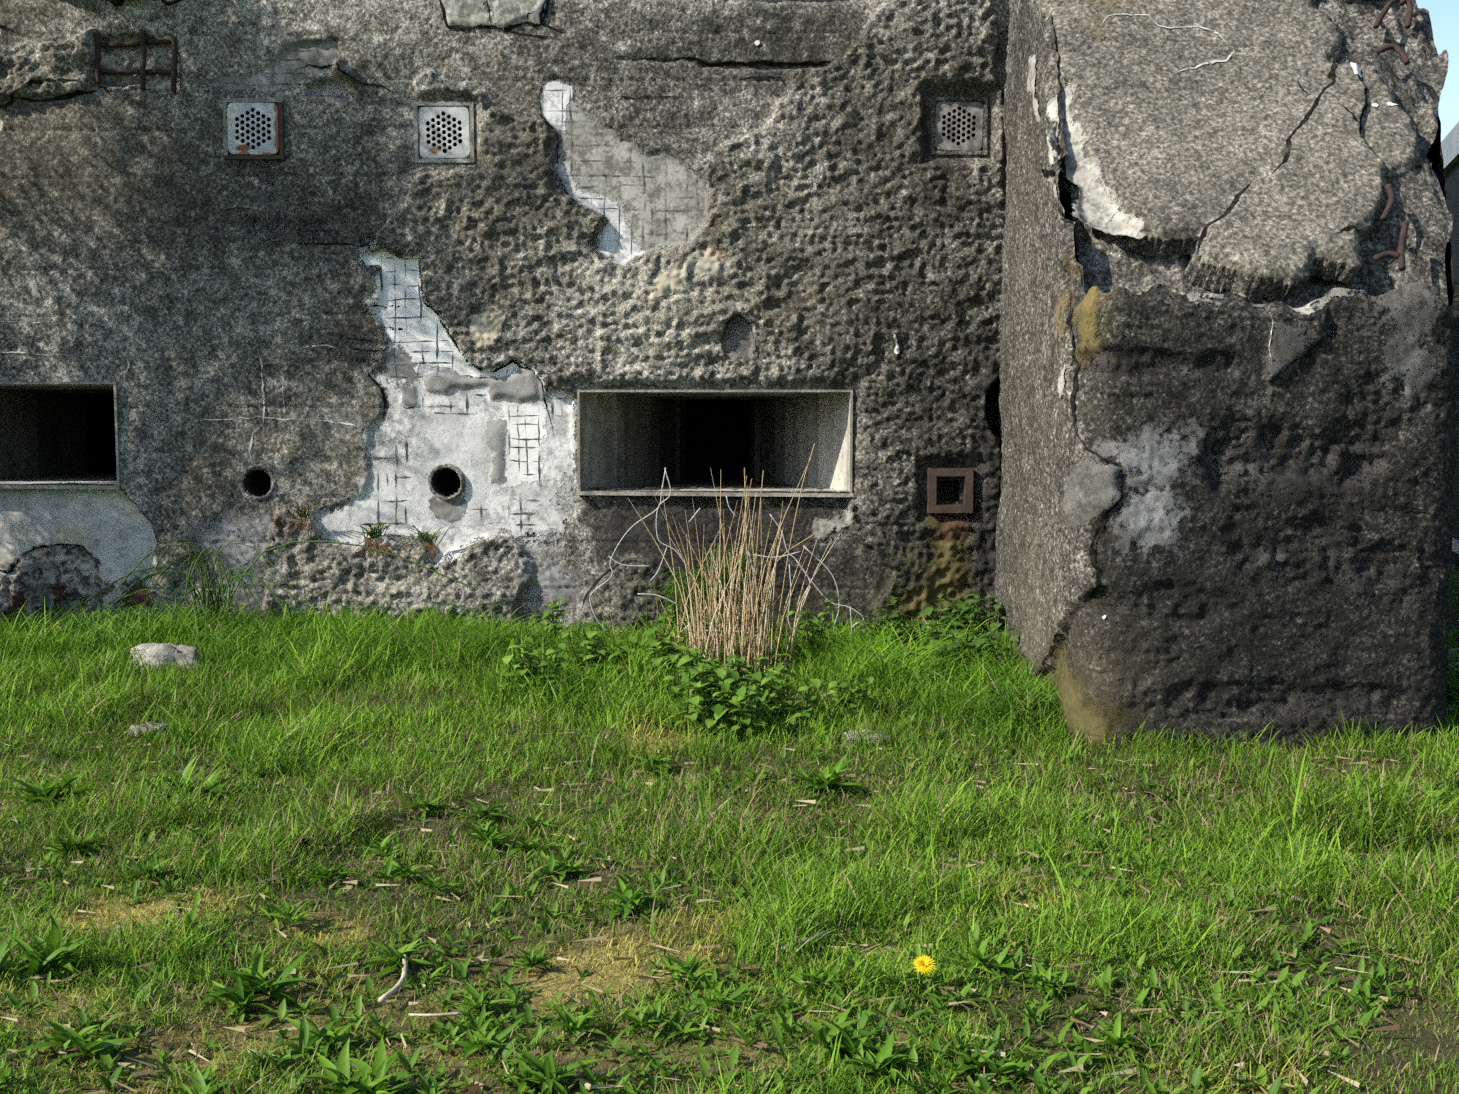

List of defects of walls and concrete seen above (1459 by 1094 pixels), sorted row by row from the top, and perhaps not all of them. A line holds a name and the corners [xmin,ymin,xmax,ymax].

peeling [539,78,711,269]
crack [613,52,840,99]
spalling [1027,52,1146,239]
crack [1197,61,1388,255]
peeling [307,239,583,565]
crack [1028,163,1124,678]
spalling [0,487,157,626]